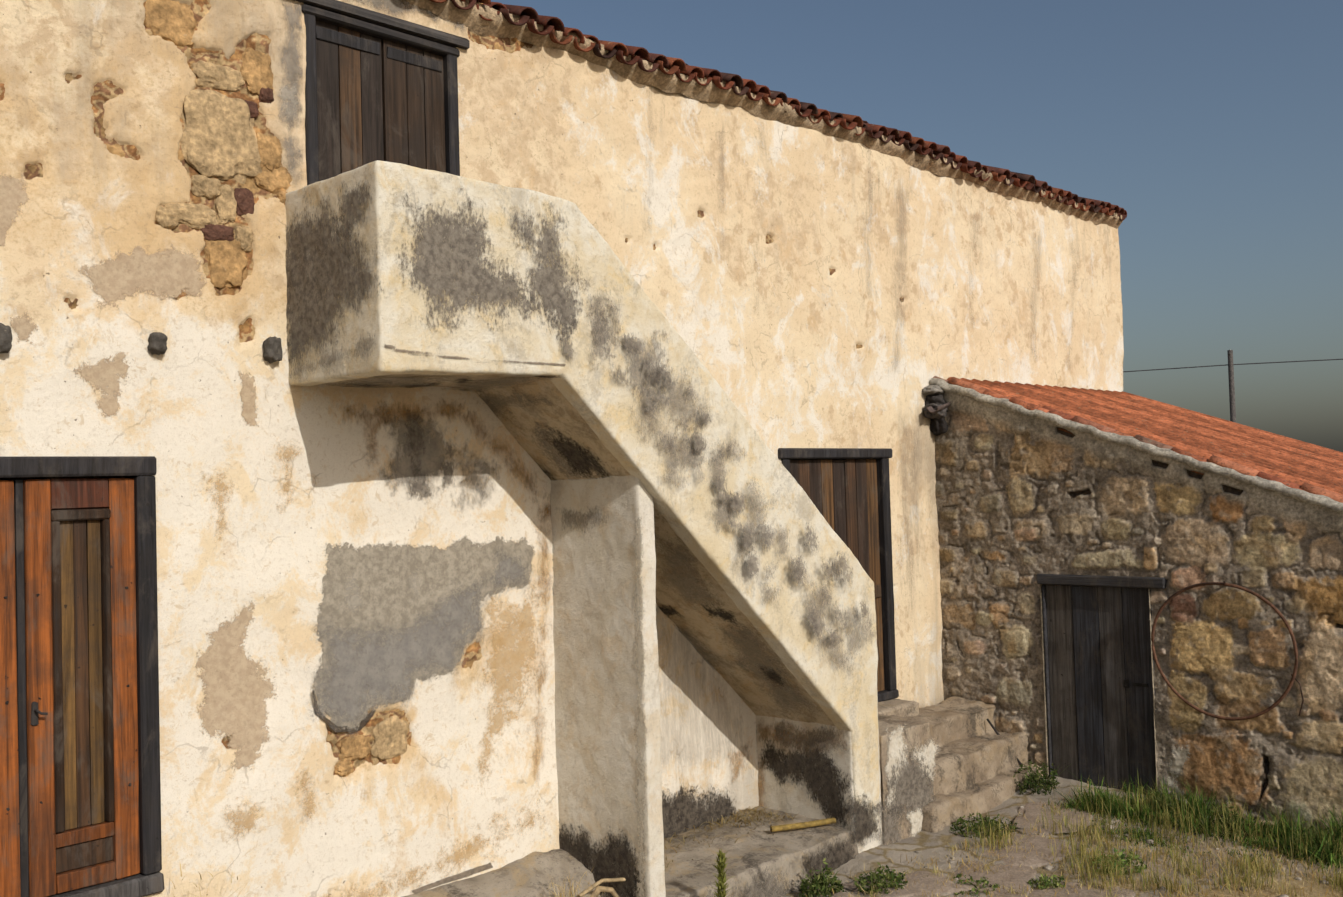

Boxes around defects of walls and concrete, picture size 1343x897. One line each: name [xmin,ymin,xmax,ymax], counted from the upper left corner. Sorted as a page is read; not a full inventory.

spalling [65,73,140,160]
spalling [79,0,292,308]
mould [285,182,382,377]
water stain [332,375,558,413]
water stain [384,191,874,668]
peeling [195,602,277,770]
spalling [326,708,412,777]
peeling [461,597,535,774]
water stain [659,540,936,877]
mould [559,824,643,897]